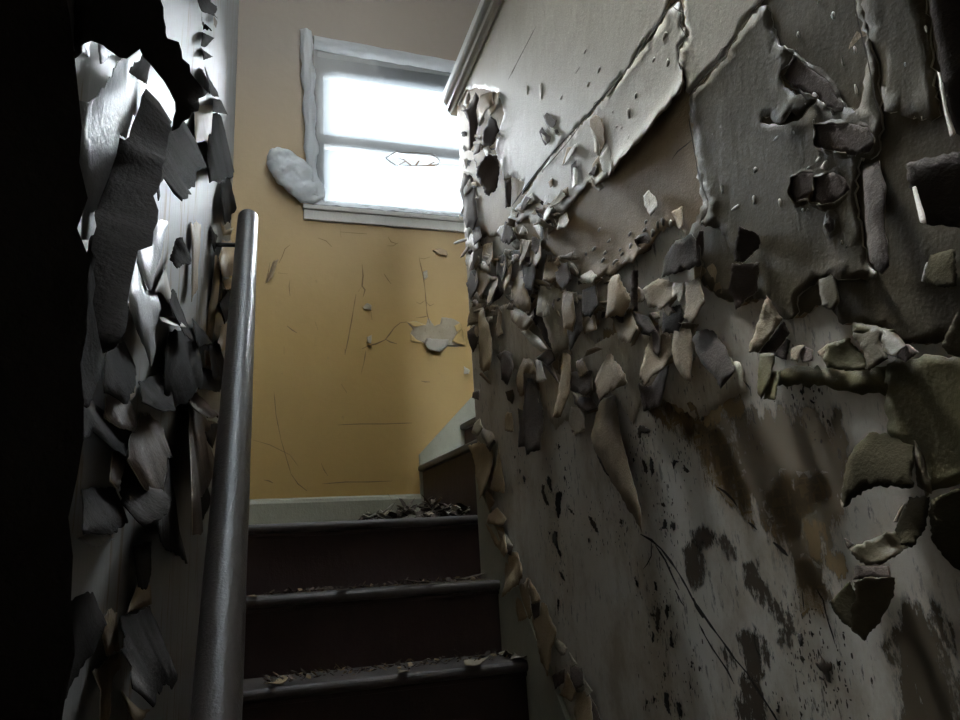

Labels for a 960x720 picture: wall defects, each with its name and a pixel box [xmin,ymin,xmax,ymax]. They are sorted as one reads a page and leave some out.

peeling [784,56,845,111]
peeling [929,0,960,138]
peeling [816,123,890,274]
peeling [906,151,960,229]
peeling [0,0,237,720]
crack [341,257,433,391]
peeling [403,91,736,720]
peeling [729,226,919,427]
peeling [921,249,957,288]
peeling [942,306,960,357]
water stain [649,394,849,720]
water stain [881,597,960,720]